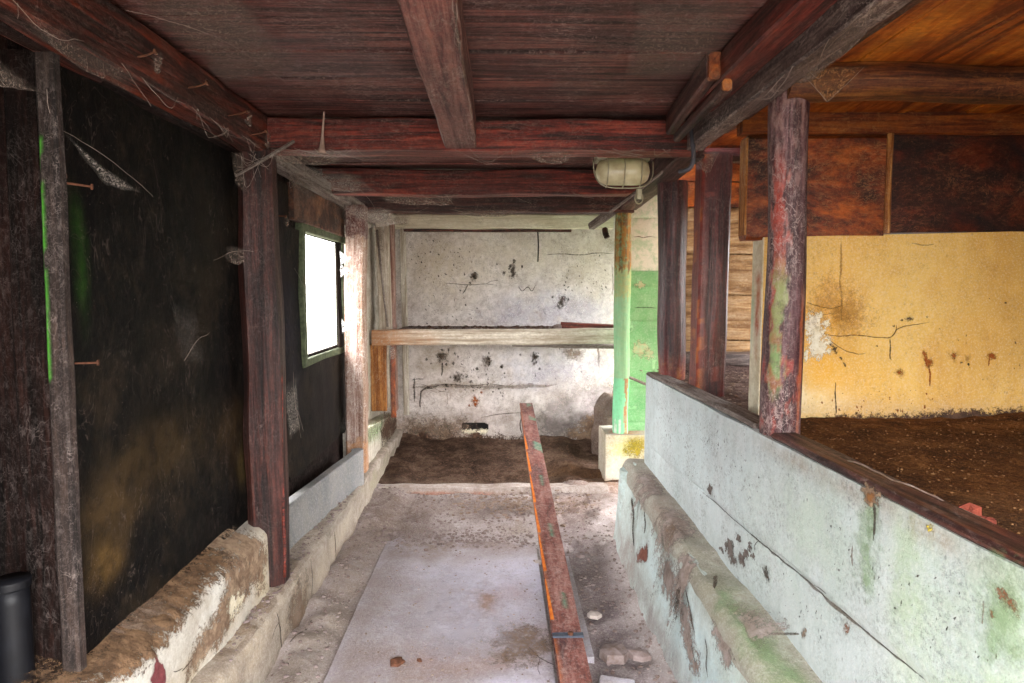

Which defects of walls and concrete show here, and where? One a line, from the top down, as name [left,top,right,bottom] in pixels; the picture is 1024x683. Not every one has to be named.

peeling [804,311,833,362]
crack [810,303,923,354]
damp [425,348,503,391]
spalling [719,532,769,583]
peeling [186,527,269,683]